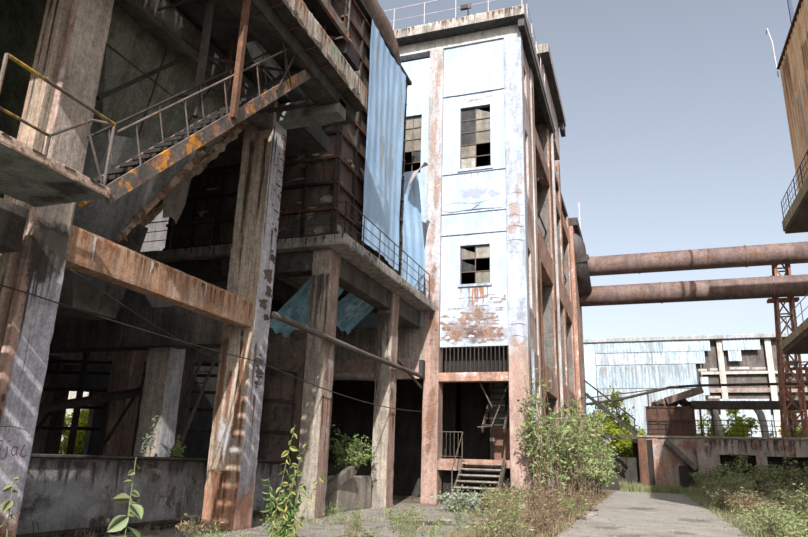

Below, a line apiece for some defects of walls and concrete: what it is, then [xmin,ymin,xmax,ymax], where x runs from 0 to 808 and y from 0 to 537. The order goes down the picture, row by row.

leakage [19,222,69,342]
corrosion [95,232,252,319]
peeling [428,266,507,345]
corrosion [214,339,257,461]
corrosion [211,469,254,518]